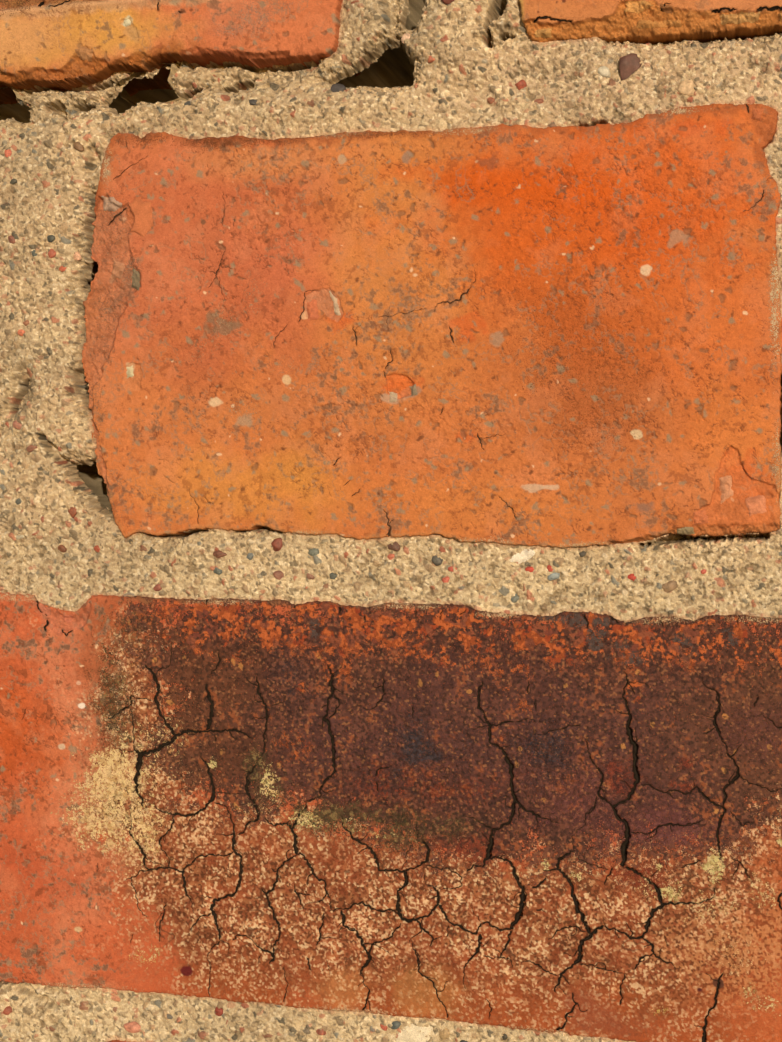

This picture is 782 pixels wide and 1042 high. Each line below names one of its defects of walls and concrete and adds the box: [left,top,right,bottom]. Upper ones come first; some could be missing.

spalling [0,17,173,105]
spalling [178,45,296,69]
spalling [523,0,782,45]
spalling [303,288,343,322]
spalling [385,373,418,402]
spalling [607,445,781,546]
crack [109,643,782,1031]
crack [694,973,723,1042]